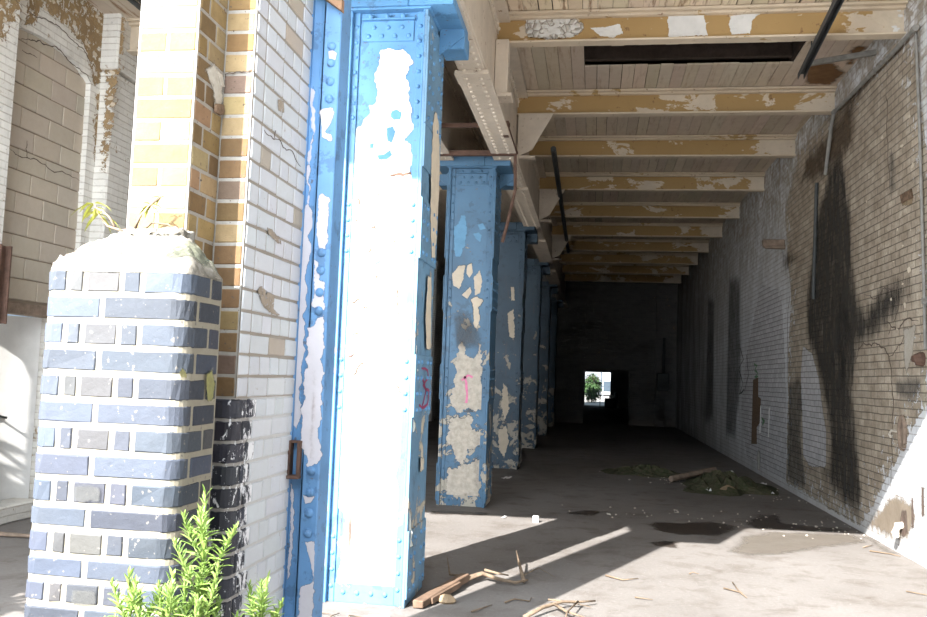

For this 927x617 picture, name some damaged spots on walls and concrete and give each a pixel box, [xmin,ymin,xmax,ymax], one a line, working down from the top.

crack [10,147,74,178]
peeling [0,0,127,173]
peeling [294,88,335,467]
peeling [337,48,414,587]
peeling [416,275,431,354]
peeling [452,262,484,328]
water stain [802,91,902,506]
peeling [785,43,927,525]
peeling [446,343,483,496]
peeling [498,384,510,456]
peeling [287,483,315,580]
peeling [297,541,315,617]